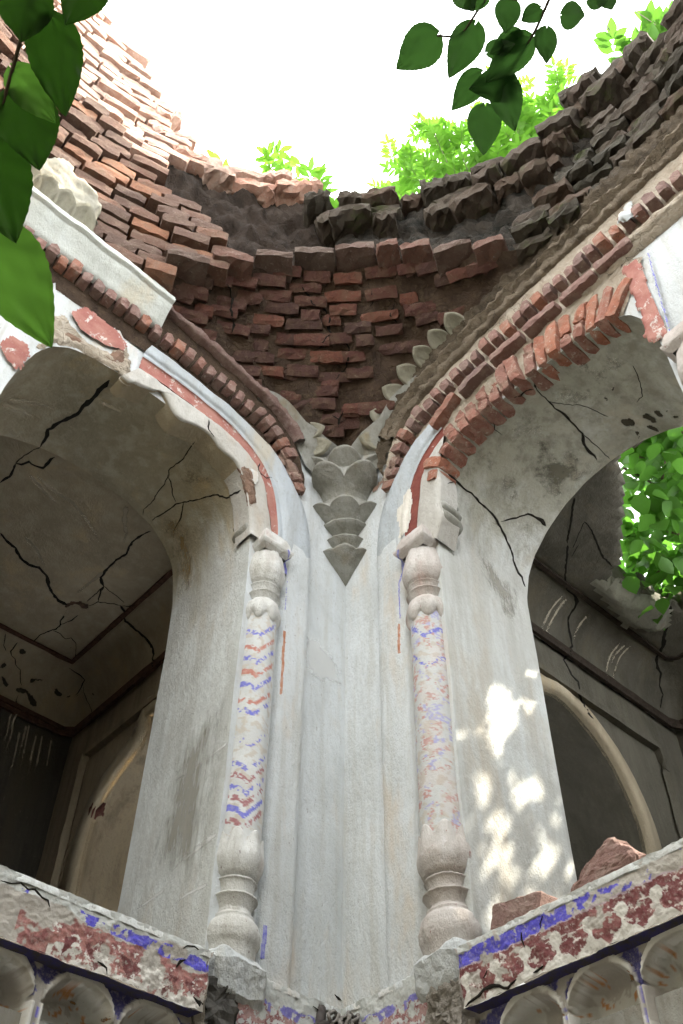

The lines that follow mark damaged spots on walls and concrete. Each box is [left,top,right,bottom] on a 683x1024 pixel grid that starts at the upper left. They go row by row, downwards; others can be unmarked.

flaking render [0,306,131,386]
crack [0,380,110,483]
crack [514,383,610,460]
flaking render [236,467,259,506]
crack [0,421,241,712]
crack [448,474,612,718]
crack [2,881,50,907]
crack [465,966,543,1008]